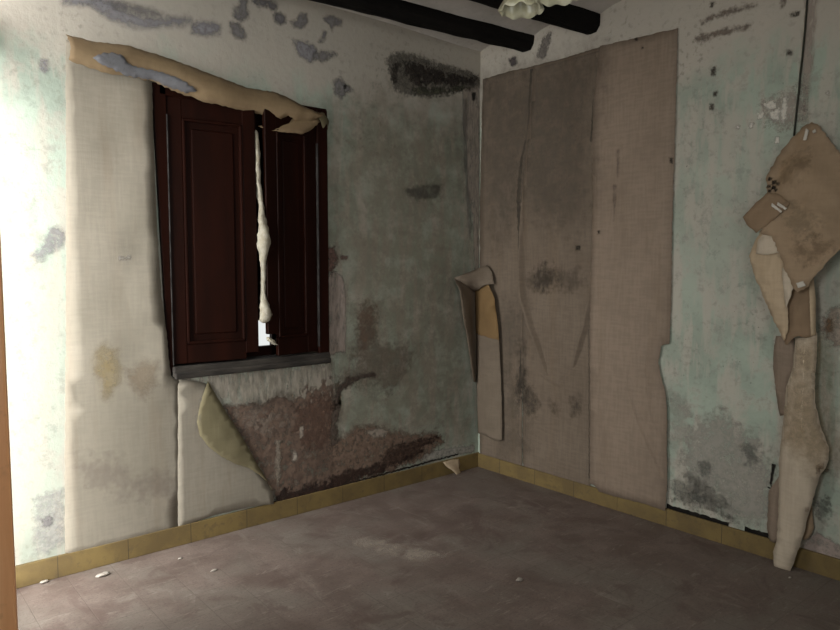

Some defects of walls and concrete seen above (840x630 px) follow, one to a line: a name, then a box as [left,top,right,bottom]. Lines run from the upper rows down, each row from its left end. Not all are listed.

spalling [184,271,444,501]
damp [673,408,772,526]
peeling [803,532,840,559]